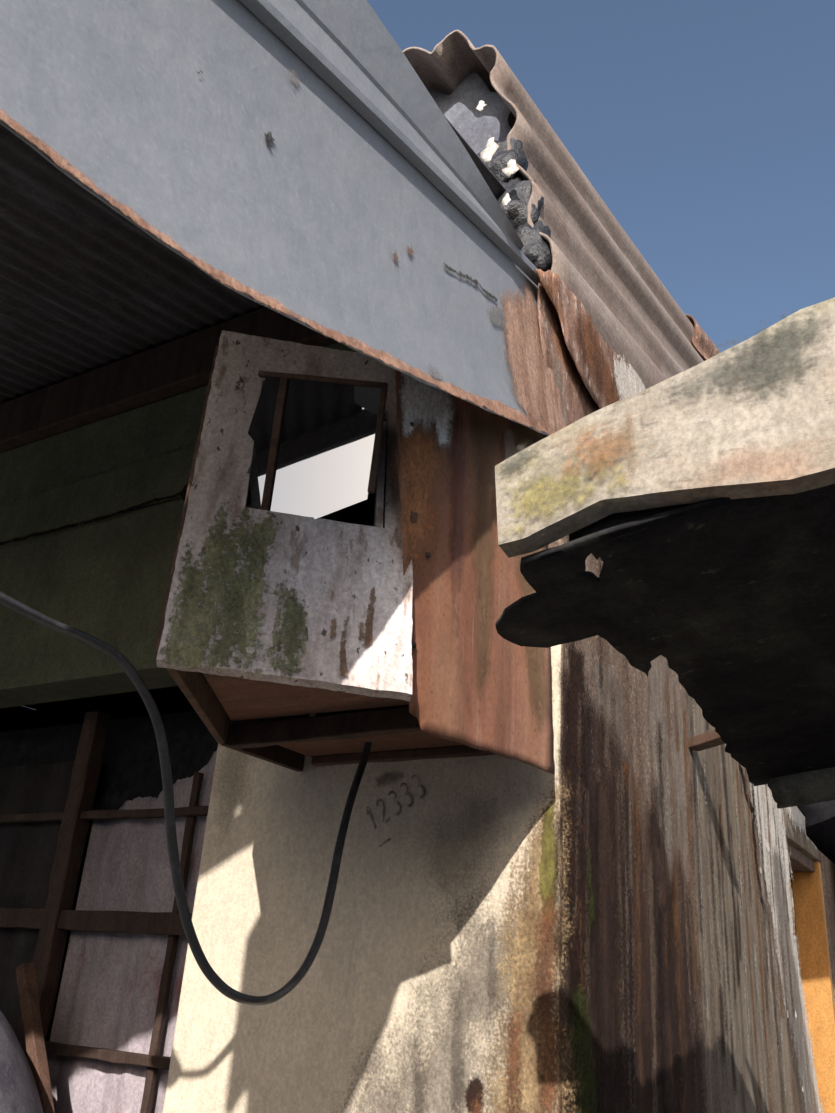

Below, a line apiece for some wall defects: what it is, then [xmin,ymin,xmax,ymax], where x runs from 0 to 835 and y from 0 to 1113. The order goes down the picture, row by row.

crack [0,493,181,545]
corrosion [0,109,565,683]
corrosion [571,313,618,405]
leakage [345,898,520,1113]
corrosion [479,774,573,1113]
peeling [749,782,826,1113]